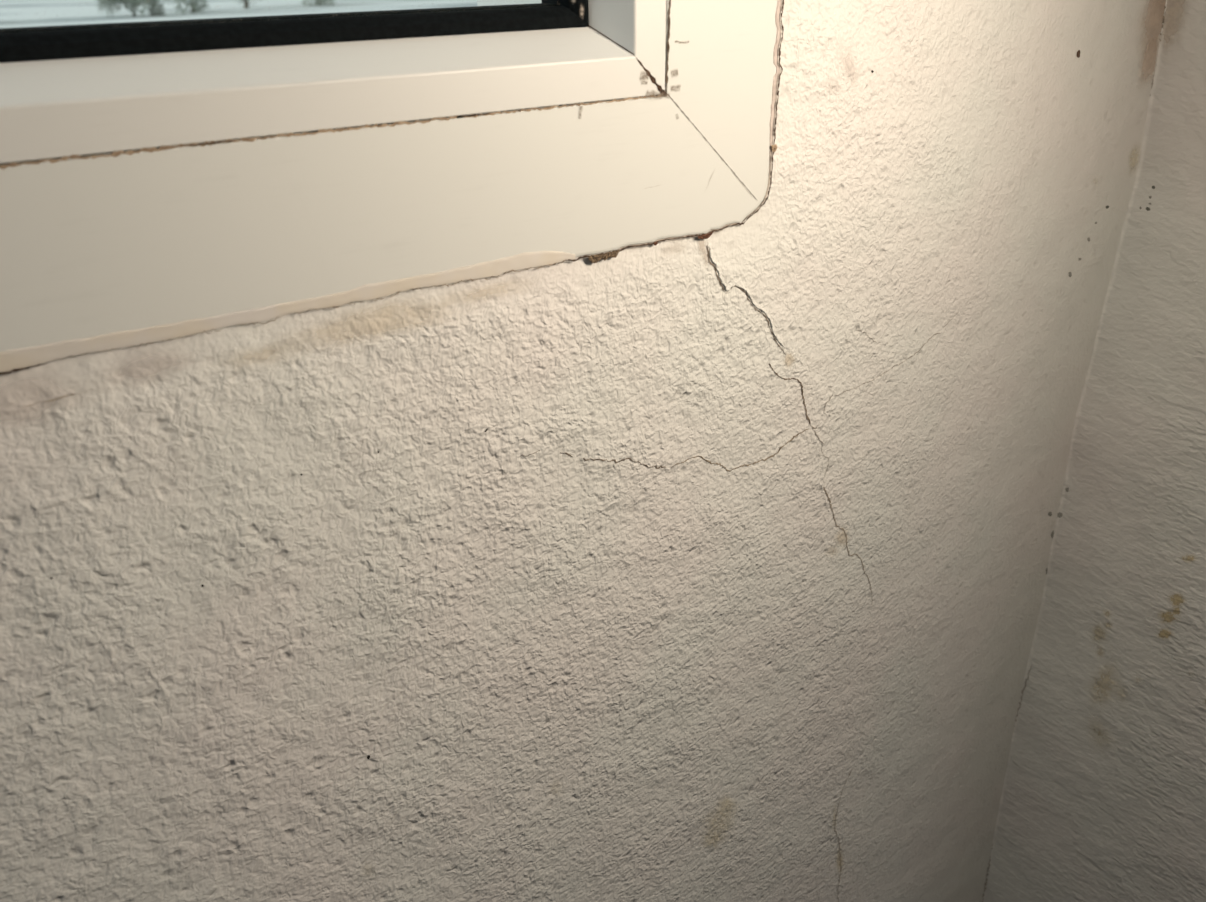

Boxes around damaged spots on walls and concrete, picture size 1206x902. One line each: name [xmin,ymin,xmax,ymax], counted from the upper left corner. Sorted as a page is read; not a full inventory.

crack [0,0,954,602]